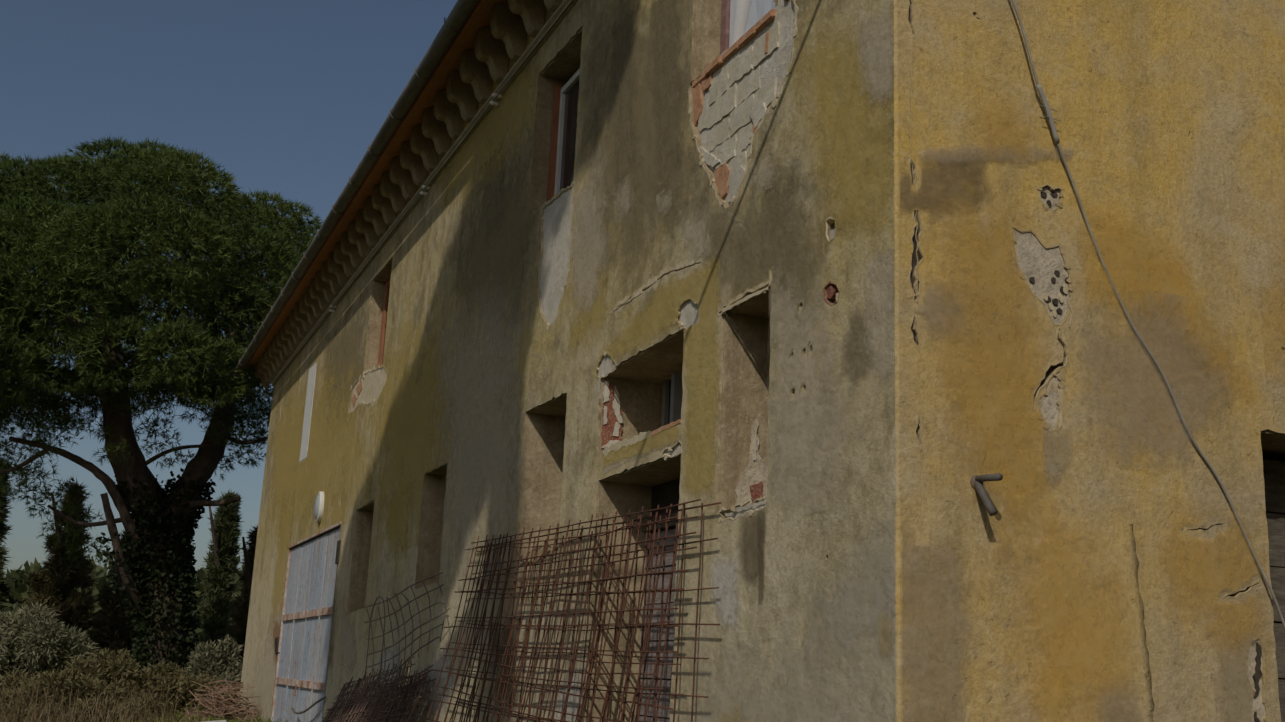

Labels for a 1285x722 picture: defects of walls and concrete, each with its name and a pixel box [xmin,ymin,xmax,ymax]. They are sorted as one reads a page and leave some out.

flaking render [687,0,799,228]
flaking render [1037,184,1064,213]
flaking render [537,182,574,331]
flaking render [673,299,699,330]
spalling [824,281,840,306]
crack [906,0,924,531]
flaking render [1012,225,1073,326]
flaking render [347,364,388,415]
flaking render [594,350,682,461]
flaking render [718,418,768,523]
leakage [712,511,764,628]
flaking render [1244,639,1272,722]